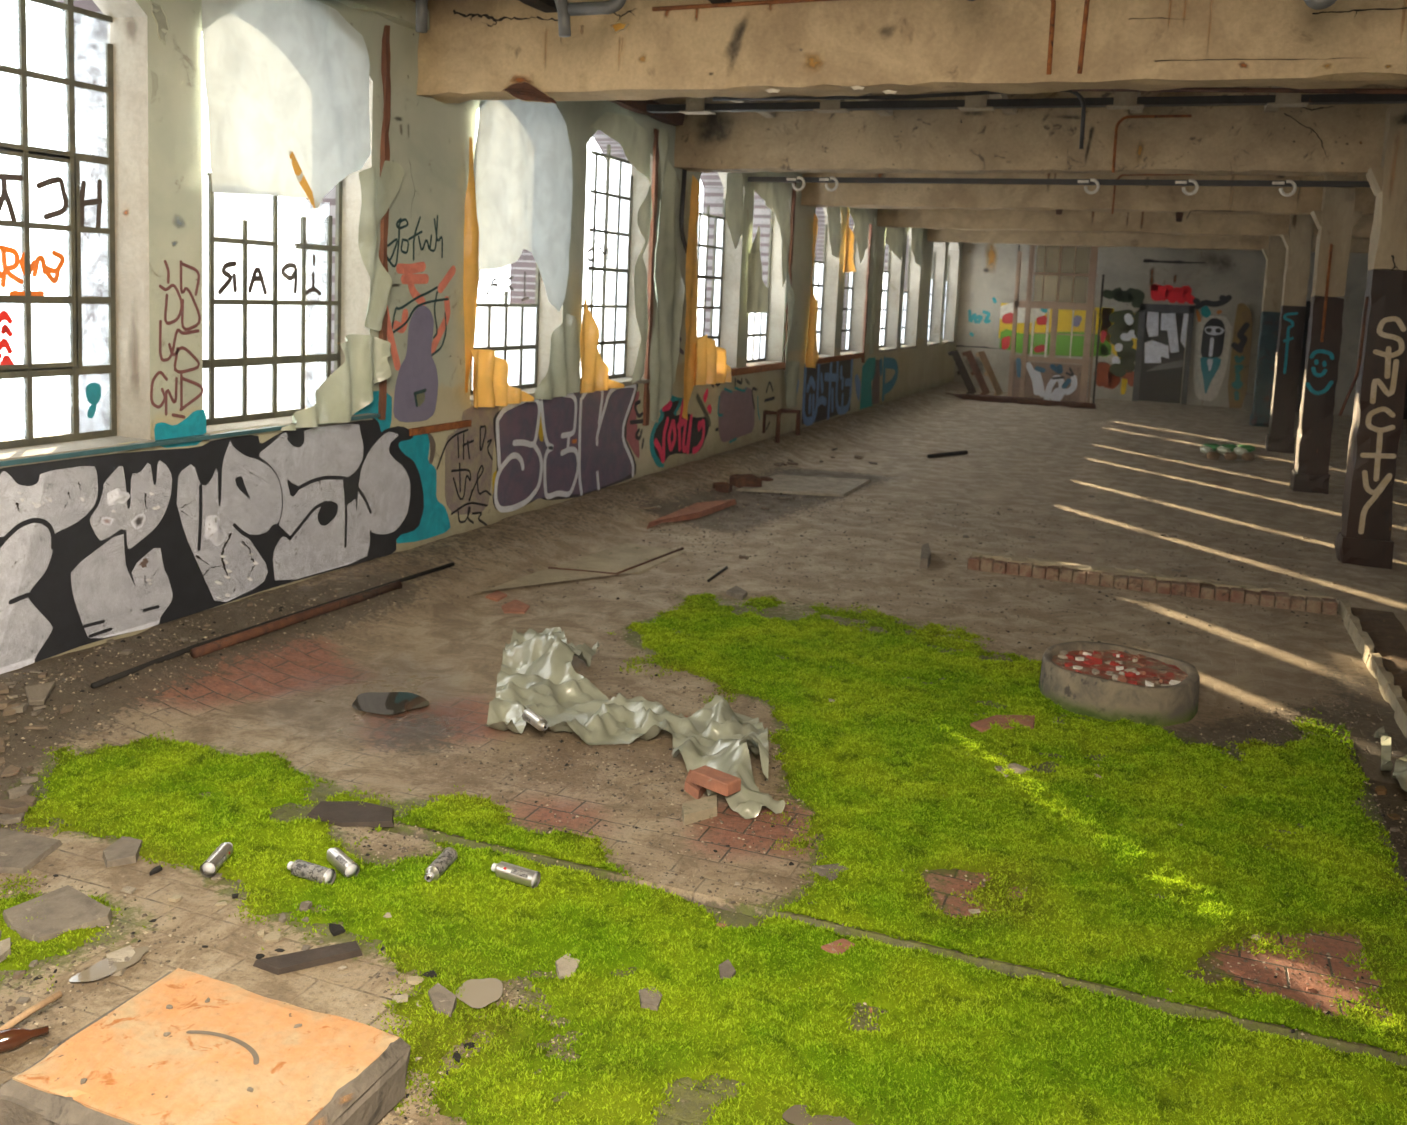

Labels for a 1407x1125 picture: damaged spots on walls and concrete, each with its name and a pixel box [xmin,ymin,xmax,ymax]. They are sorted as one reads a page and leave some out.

crack [453,10,571,27]